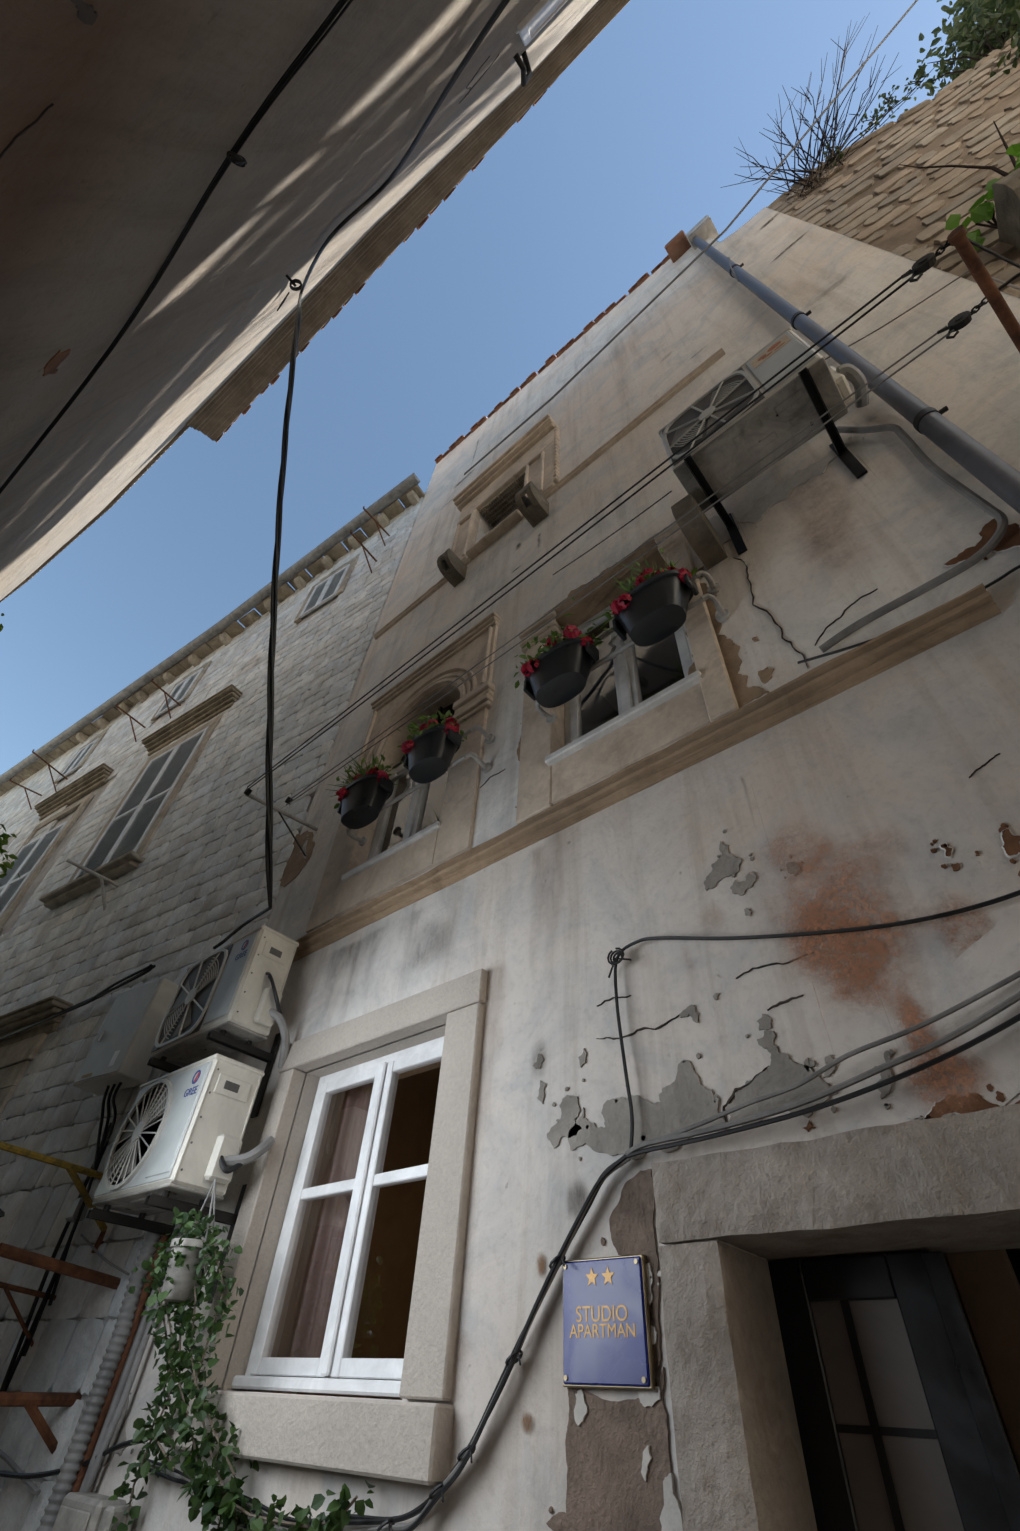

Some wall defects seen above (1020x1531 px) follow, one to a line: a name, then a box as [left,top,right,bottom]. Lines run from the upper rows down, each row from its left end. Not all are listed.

peeling [943,511,1020,567]
peeling [697,566,774,708]
crack [733,557,877,668]
peeling [704,829,757,916]
flaking render [930,839,960,872]
flaking render [998,823,1020,877]
rust [779,843,983,1106]
crack [596,995,679,1040]
peeling [679,1005,699,1023]
flaking render [907,1084,1020,1121]
peeling [533,1013,838,1531]